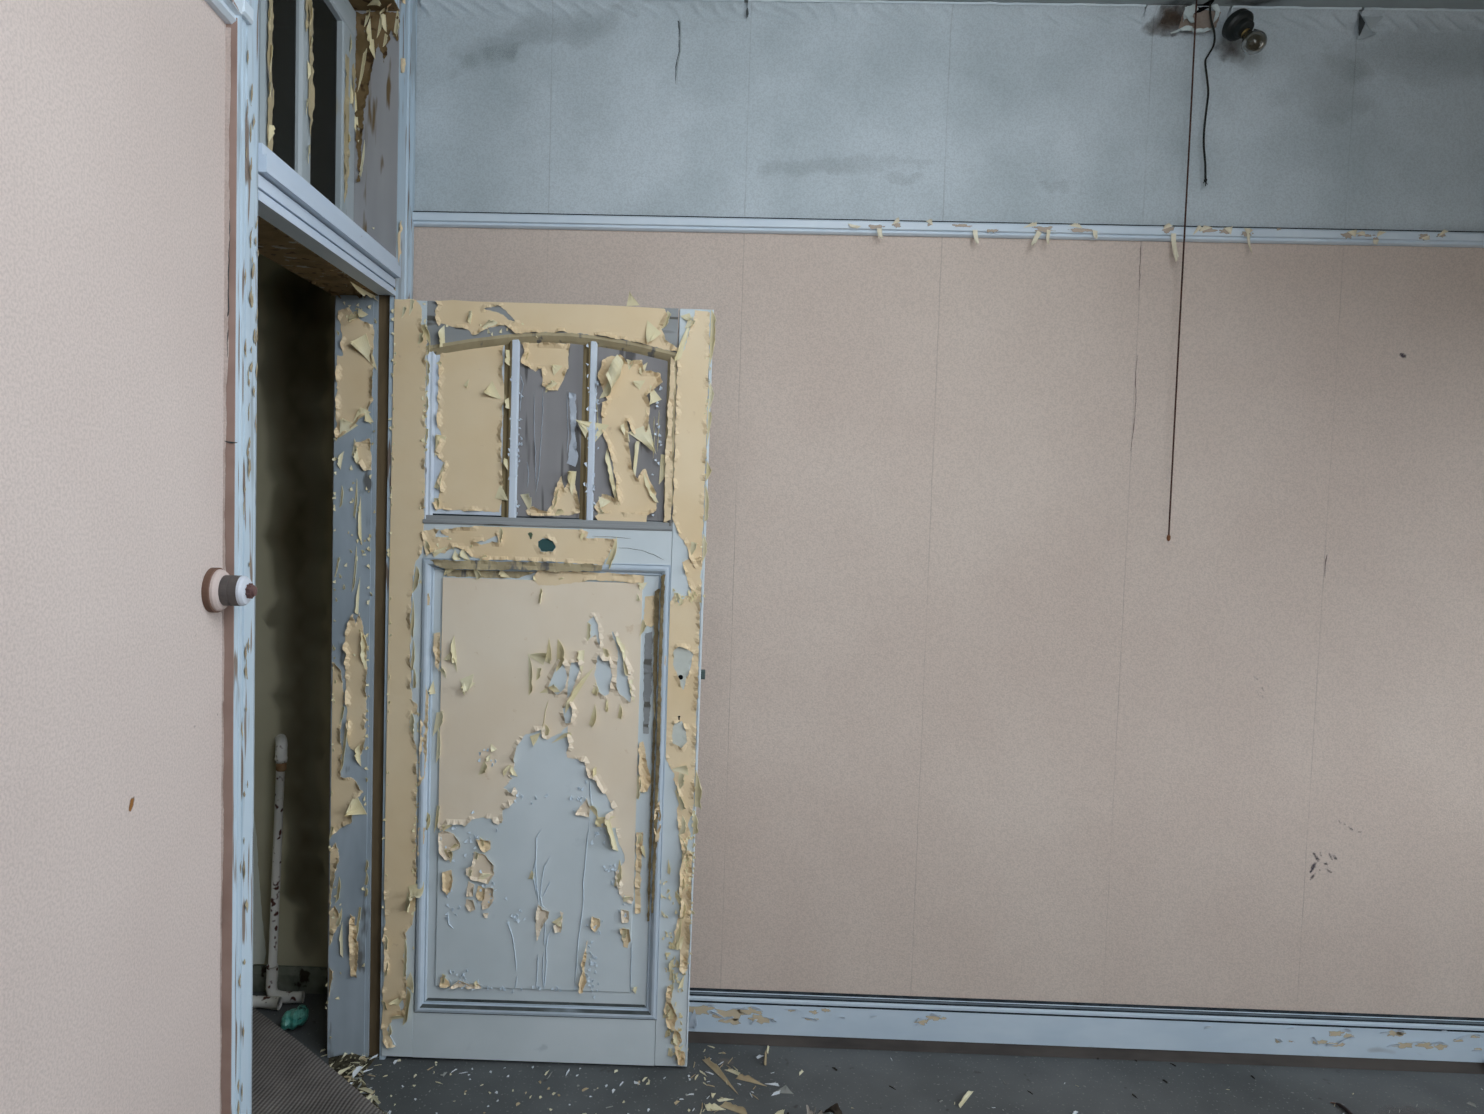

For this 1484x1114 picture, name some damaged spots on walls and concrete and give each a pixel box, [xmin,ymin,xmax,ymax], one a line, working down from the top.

peeling [246,0,274,178]
peeling [305,0,315,135]
peeling [344,0,406,202]
flaking render [1178,10,1221,32]
peeling [1023,222,1098,245]
peeling [243,216,259,515]
peeling [286,252,845,1114]
peeling [1276,1027,1355,1047]
peeling [1382,1029,1484,1052]